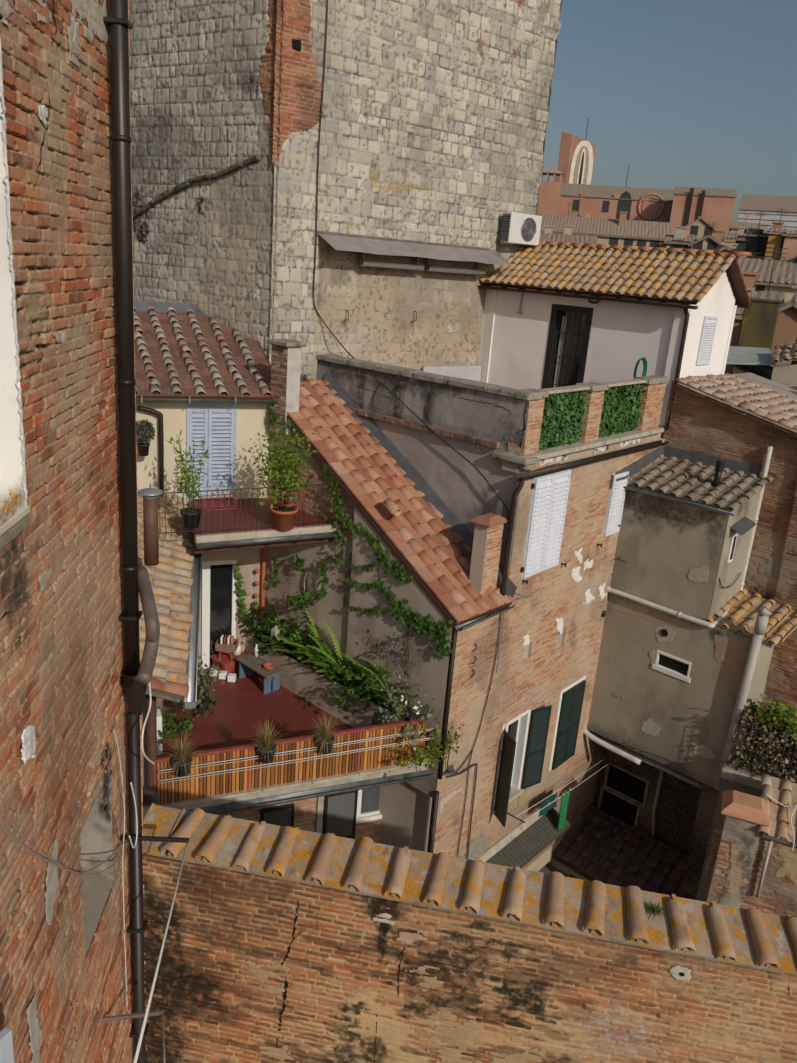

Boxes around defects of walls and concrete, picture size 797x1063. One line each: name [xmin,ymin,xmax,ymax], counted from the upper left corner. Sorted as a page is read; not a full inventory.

flaking render [0,0,52,28]
flaking render [67,0,109,67]
flaking render [38,104,48,126]
spalling [259,0,324,163]
flaking render [0,37,28,507]
leakage [365,896,398,961]
crack [271,901,302,1063]